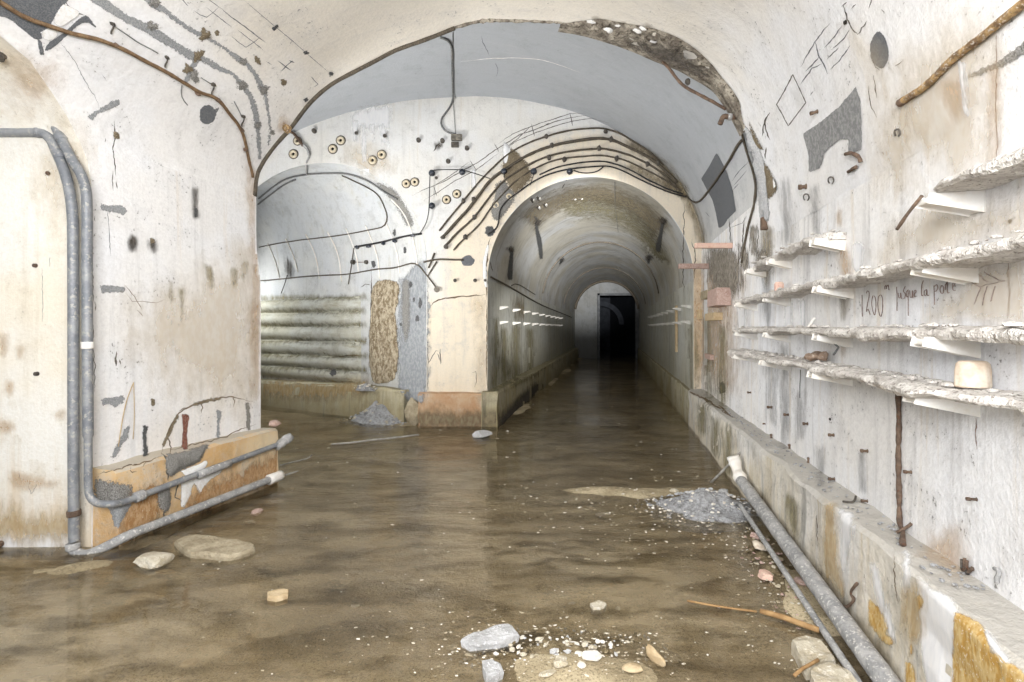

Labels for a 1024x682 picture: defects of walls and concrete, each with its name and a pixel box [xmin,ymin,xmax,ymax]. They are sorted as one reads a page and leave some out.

spalling [455,18,777,227]
peeling [113,426,130,458]
crack [100,396,253,517]
spalling [165,410,222,507]
water stain [0,513,68,559]